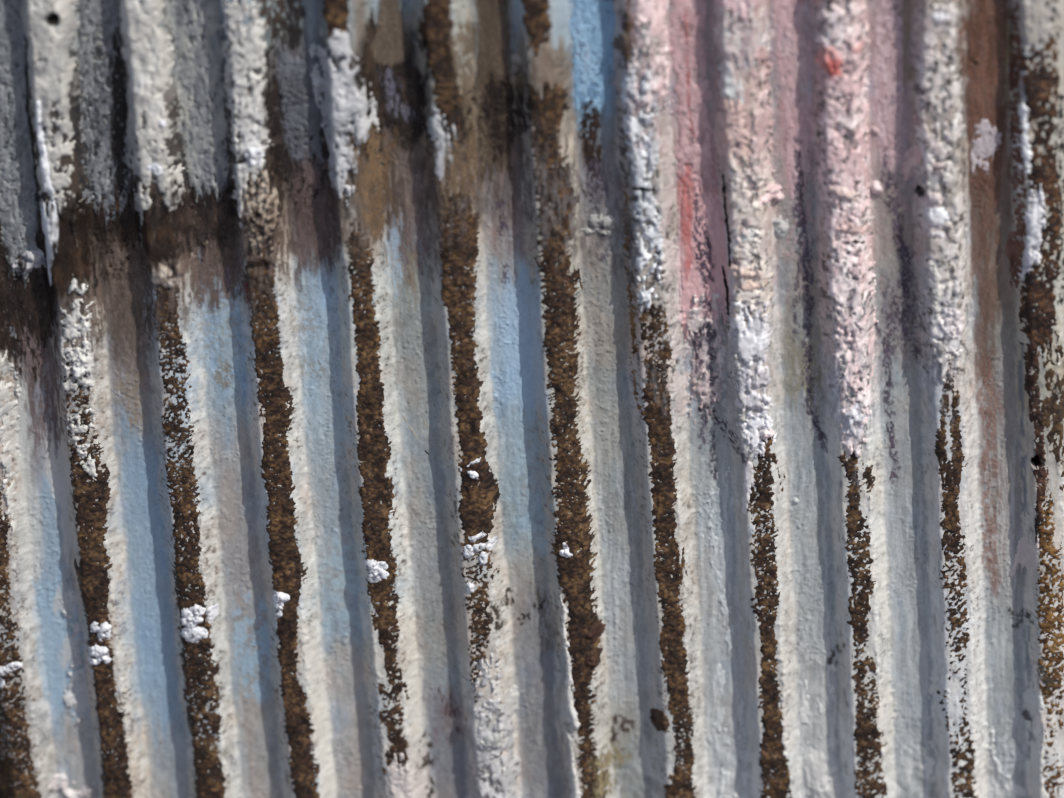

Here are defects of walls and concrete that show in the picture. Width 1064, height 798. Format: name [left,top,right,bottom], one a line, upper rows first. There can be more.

corrosion [0,479,42,798]
corrosion [63,358,133,798]
corrosion [153,285,227,798]
corrosion [245,241,320,798]
corrosion [344,217,410,775]
corrosion [437,181,501,703]
corrosion [524,78,634,798]
corrosion [619,182,697,798]
corrosion [747,437,792,798]
corrosion [837,451,887,798]
corrosion [934,369,978,798]
corrosion [958,0,1064,798]